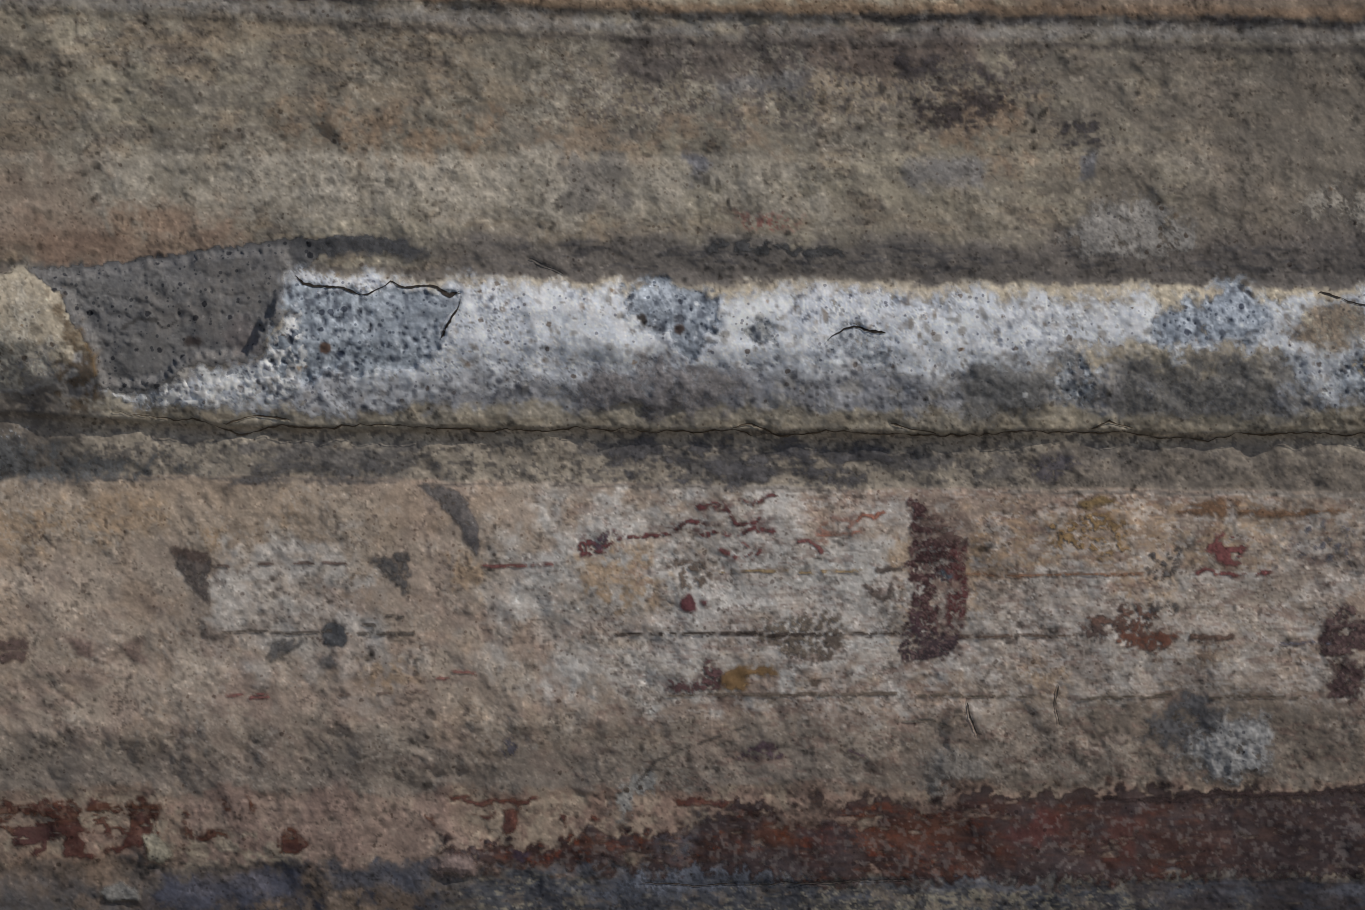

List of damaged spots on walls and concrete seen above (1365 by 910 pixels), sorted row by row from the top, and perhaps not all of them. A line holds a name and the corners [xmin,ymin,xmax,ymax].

water stain [315,235,430,263]
water stain [706,239,845,259]
crack [296,276,461,338]
water stain [113,311,307,411]
water stain [961,357,1044,420]
water stain [1115,355,1281,419]
crack [115,411,1365,442]
water stain [579,354,917,492]